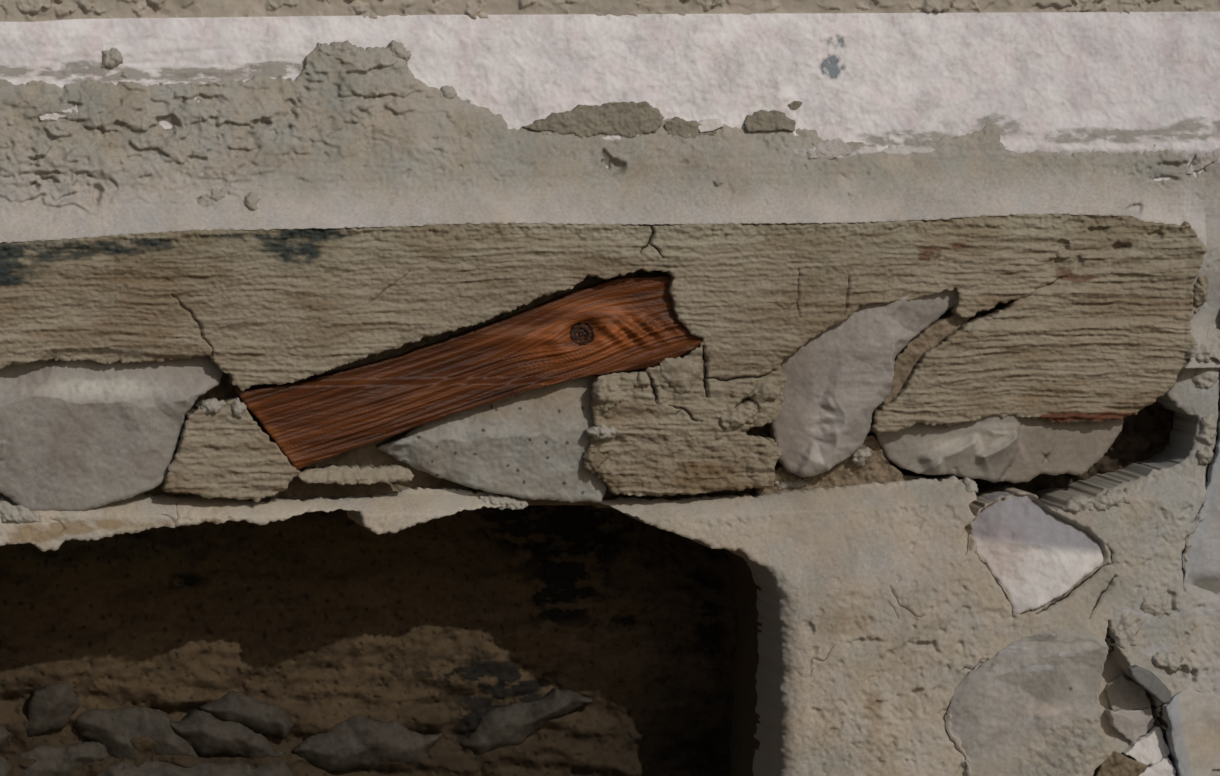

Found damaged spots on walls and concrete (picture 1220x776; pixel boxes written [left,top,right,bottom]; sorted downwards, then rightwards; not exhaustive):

spalling [522,101,717,141]
spalling [744,101,802,134]
crack [171,294,213,353]
spalling [302,270,667,380]
spalling [969,302,1004,319]
spalling [184,372,274,442]
spalling [261,432,483,500]
spalling [526,487,754,508]
crack [647,346,775,422]
spalling [746,423,771,438]
spalling [949,401,1175,495]
crack [1182,371,1220,585]